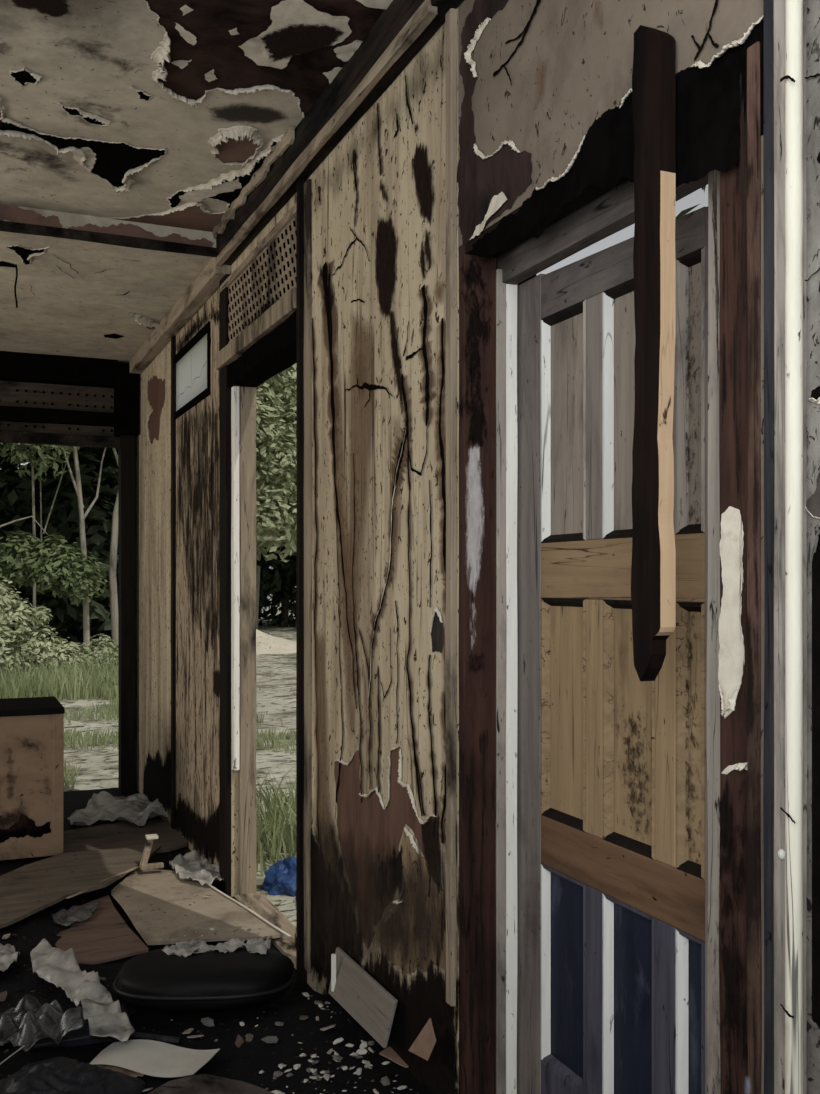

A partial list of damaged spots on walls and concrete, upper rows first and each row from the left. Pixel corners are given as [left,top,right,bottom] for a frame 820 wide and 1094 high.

peeling [0,97,167,193]
peeling [0,125,284,247]
peeling [129,0,393,118]
crack [493,0,541,86]
peeling [457,0,635,257]
crack [691,0,719,60]
peeling [675,16,764,188]
crack [780,73,820,83]
leakage [311,250,333,314]
leakage [387,310,402,409]
leakage [177,404,219,652]
leakage [336,321,372,690]